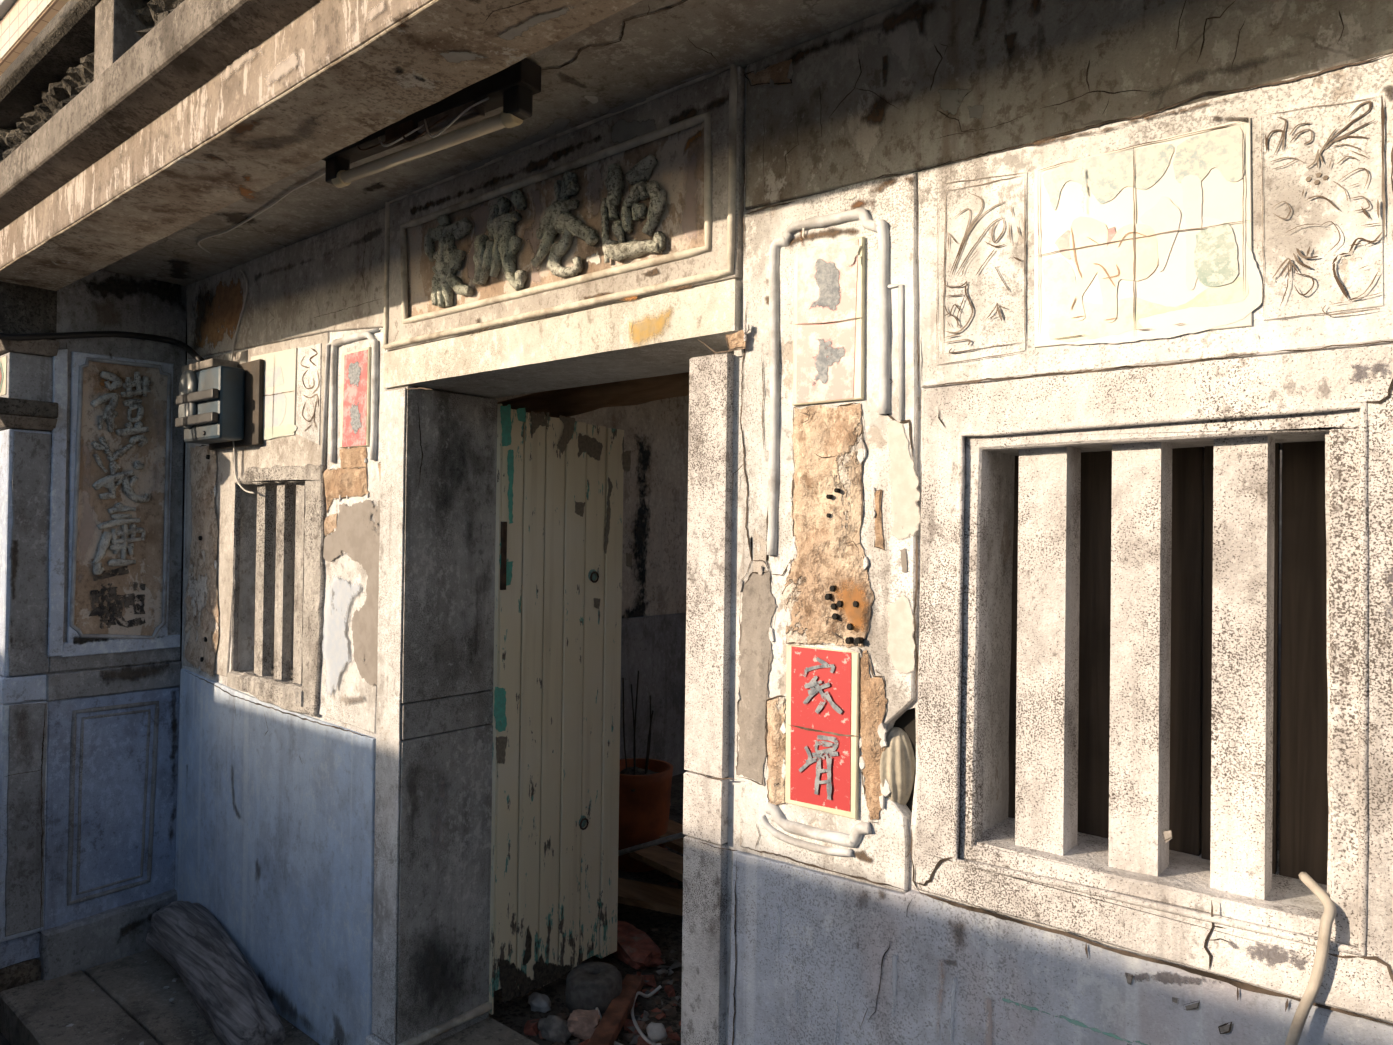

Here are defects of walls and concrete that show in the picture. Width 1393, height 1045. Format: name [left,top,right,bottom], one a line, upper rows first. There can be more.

crack [542,0,687,70]
crack [874,0,1393,179]
crack [743,54,895,262]
crack [1385,147,1393,191]
flaking render [323,446,381,537]
peeling [500,404,603,524]
peeling [322,575,359,696]
flaking render [735,402,920,823]
crack [912,534,920,700]
peeling [494,687,507,764]
peeling [497,926,571,1004]
crack [701,824,1393,1045]